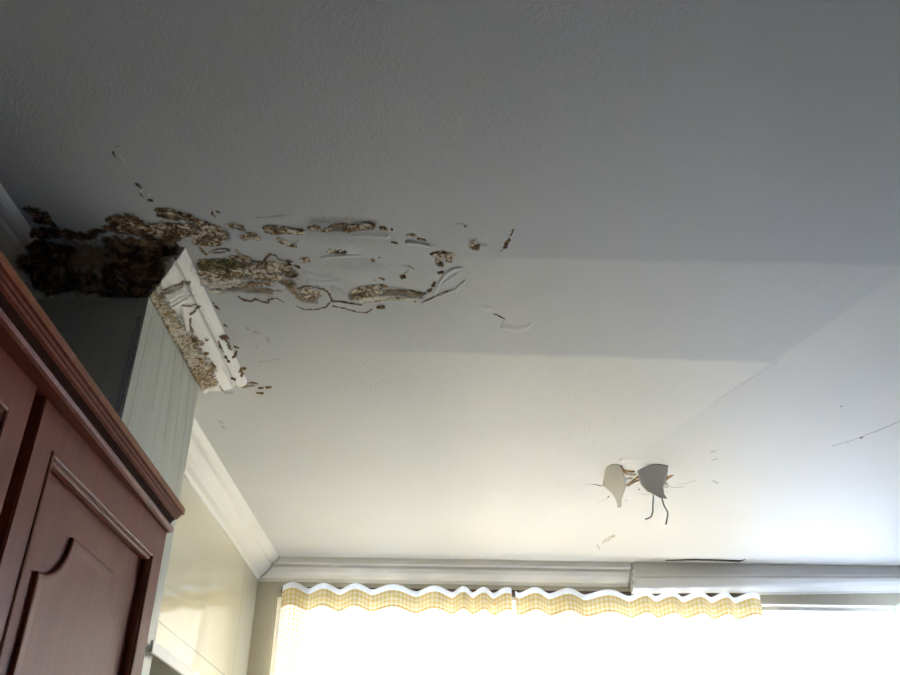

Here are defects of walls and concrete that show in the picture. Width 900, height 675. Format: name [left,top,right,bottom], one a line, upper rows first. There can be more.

leakage [17,206,181,298]
flaking render [115,183,398,269]
spalling [430,251,455,275]
flaking render [149,281,239,391]
peeling [603,454,674,509]